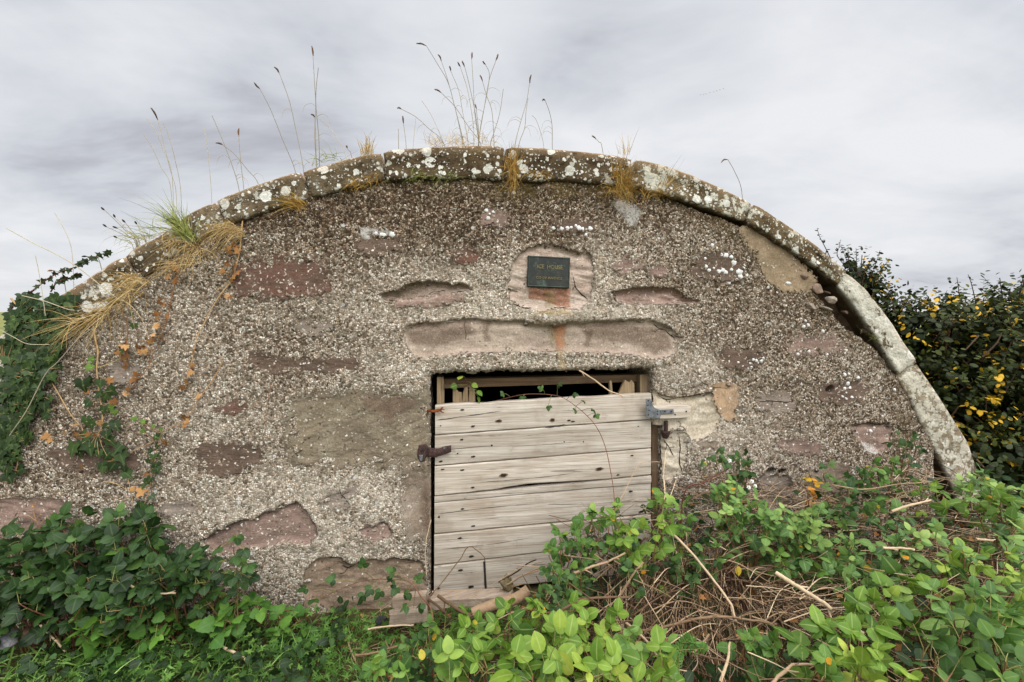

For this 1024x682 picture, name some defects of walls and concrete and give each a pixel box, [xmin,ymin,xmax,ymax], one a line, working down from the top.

peeling [688,226,818,295]
peeling [281,385,431,543]
peeling [651,340,767,480]